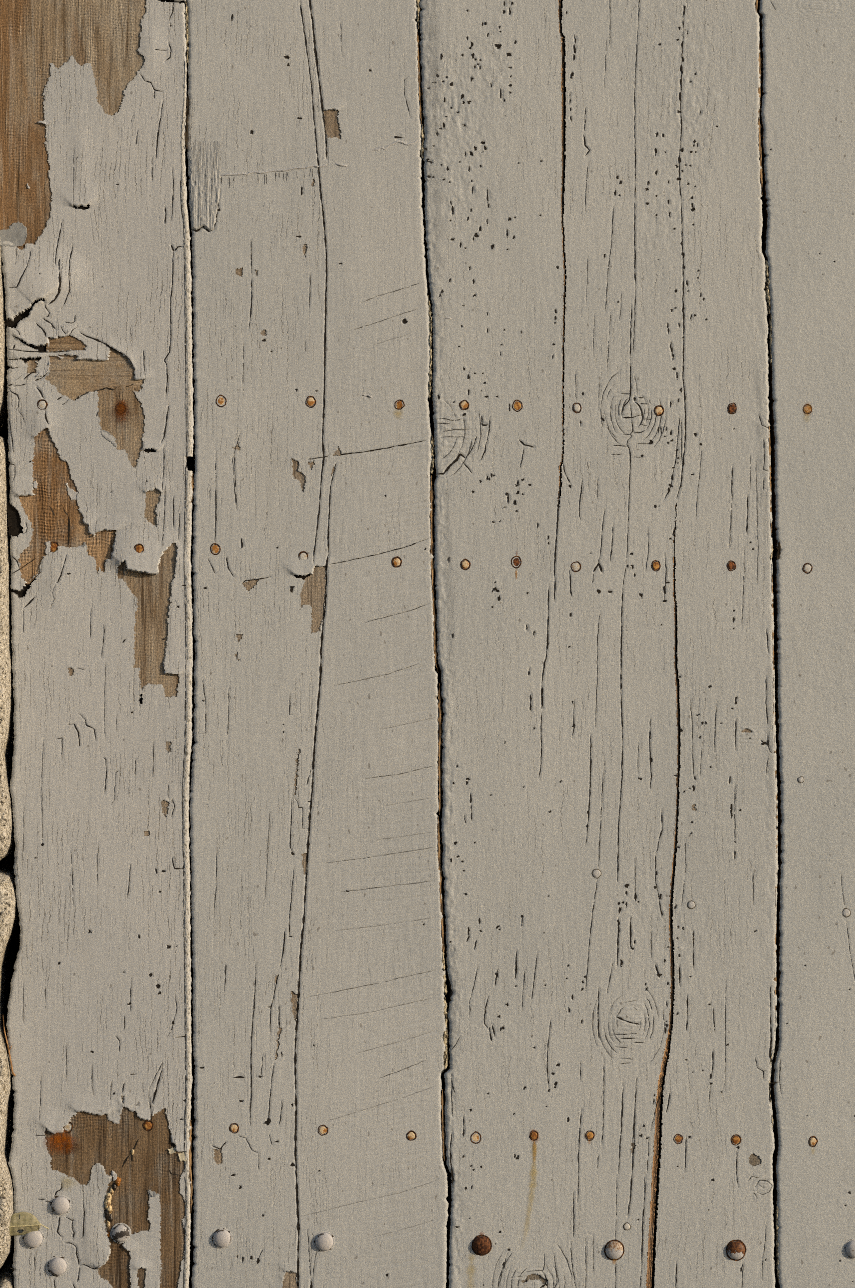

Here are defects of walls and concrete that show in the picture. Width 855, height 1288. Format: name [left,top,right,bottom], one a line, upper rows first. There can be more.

peeling [0,0,147,250]
peeling [323,108,341,139]
spalling [424,36,516,250]
spalling [482,1,517,102]
peeling [16,335,145,467]
crack [8,0,271,645]
peeling [18,428,186,698]
crack [23,624,229,889]
peeling [290,566,326,634]
crack [66,0,551,1288]
crack [492,0,782,1288]
peeling [44,1092,187,1288]